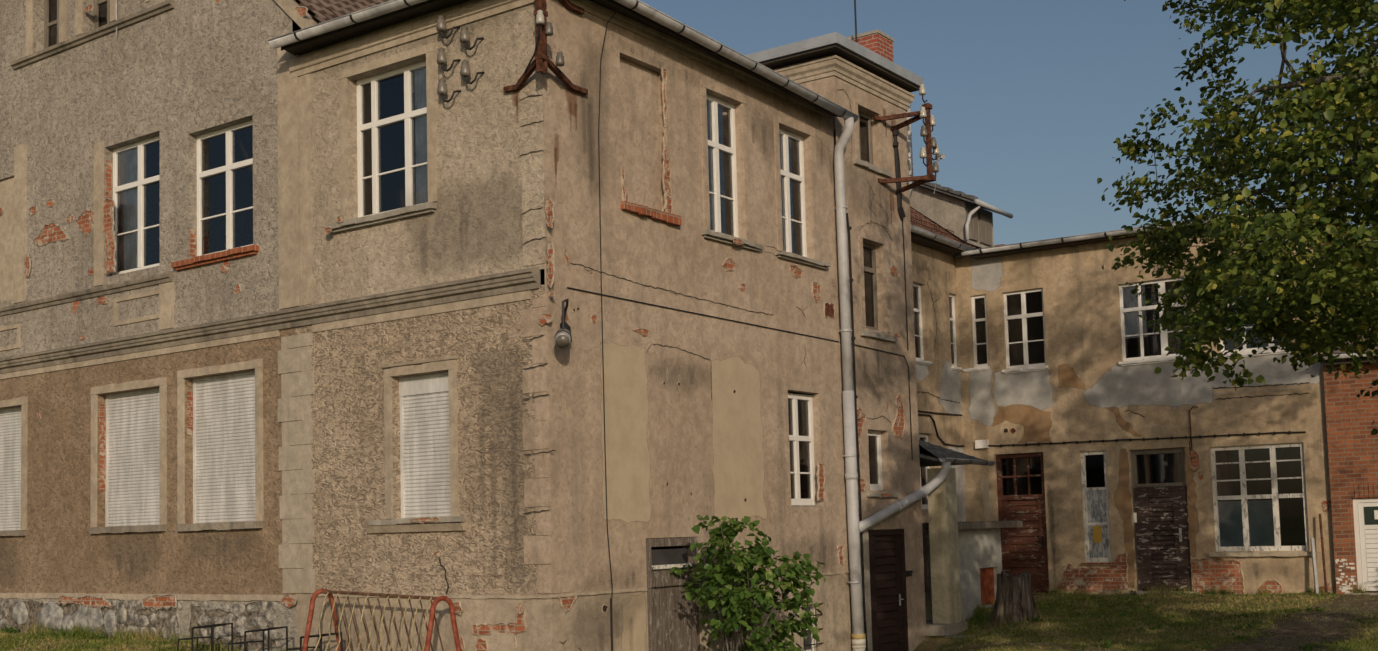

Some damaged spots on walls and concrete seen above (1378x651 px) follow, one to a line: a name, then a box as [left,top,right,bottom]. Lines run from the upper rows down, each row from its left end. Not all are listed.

flaking render [661,67,673,214]
flaking render [24,160,116,278]
flaking render [855,408,893,498]
peeling [993,404,1052,443]
flaking render [1055,407,1142,593]
flaking render [1184,447,1283,595]
flaking render [0,594,297,651]
flaking render [453,601,528,651]